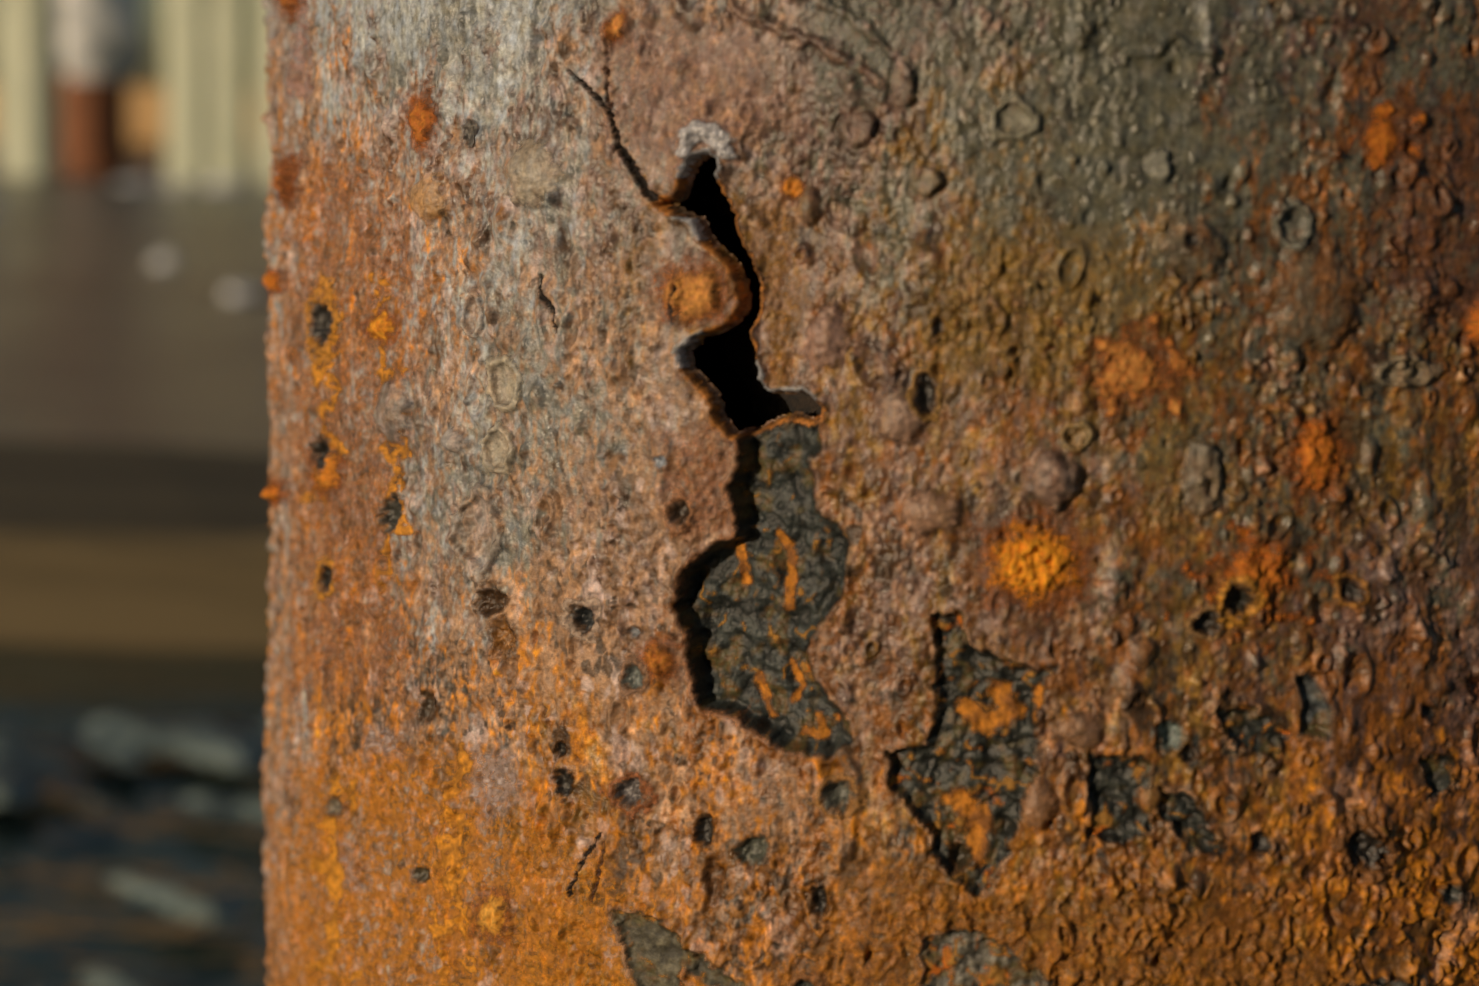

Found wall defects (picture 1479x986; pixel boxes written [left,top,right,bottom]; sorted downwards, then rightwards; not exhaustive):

rust [404,81,437,153]
crack [566,37,676,211]
rust [261,269,408,505]
crack [668,285,677,325]
rust [1075,312,1203,423]
rust [375,413,413,586]
spalling [672,414,867,820]
rust [970,502,1096,618]
rust [1164,503,1334,644]
spalling [883,608,1059,897]
rust [280,742,674,986]
spalling [608,905,746,986]